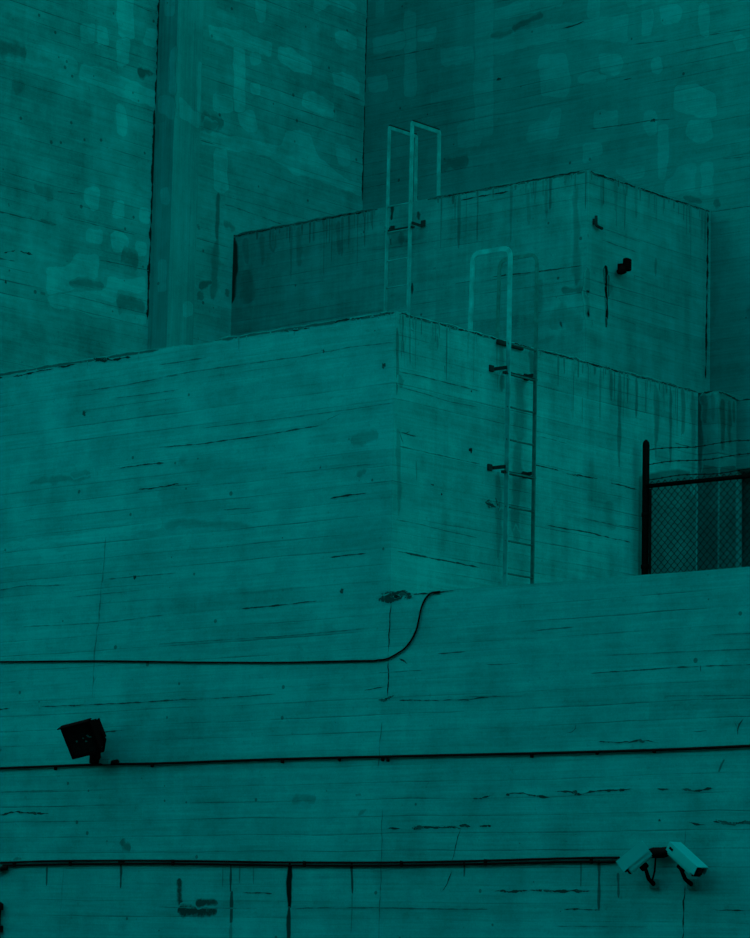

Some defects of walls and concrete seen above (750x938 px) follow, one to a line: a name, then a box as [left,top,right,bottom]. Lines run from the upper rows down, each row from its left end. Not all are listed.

water stain [196,193,378,305]
water stain [428,170,707,335]
water stain [215,312,736,575]
crack [680,886,688,938]